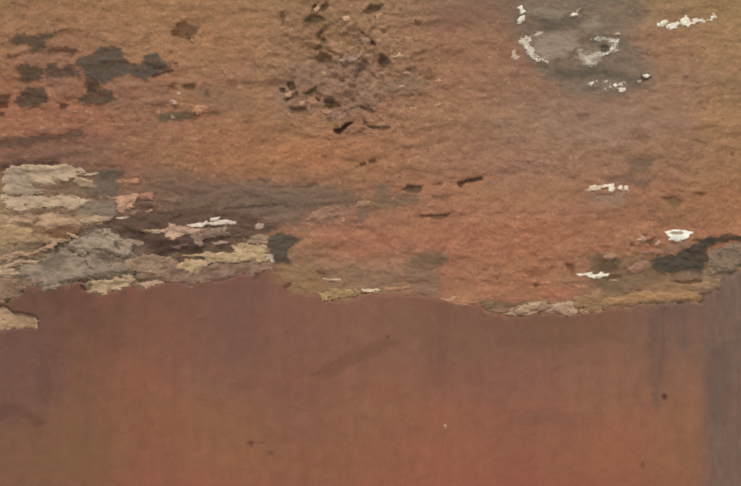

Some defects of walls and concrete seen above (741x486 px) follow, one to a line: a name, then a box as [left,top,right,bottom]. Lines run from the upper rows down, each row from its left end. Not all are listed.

mould [0,29,170,115]
leakage [510,0,651,97]
spalling [0,0,741,331]
leakage [649,234,741,279]